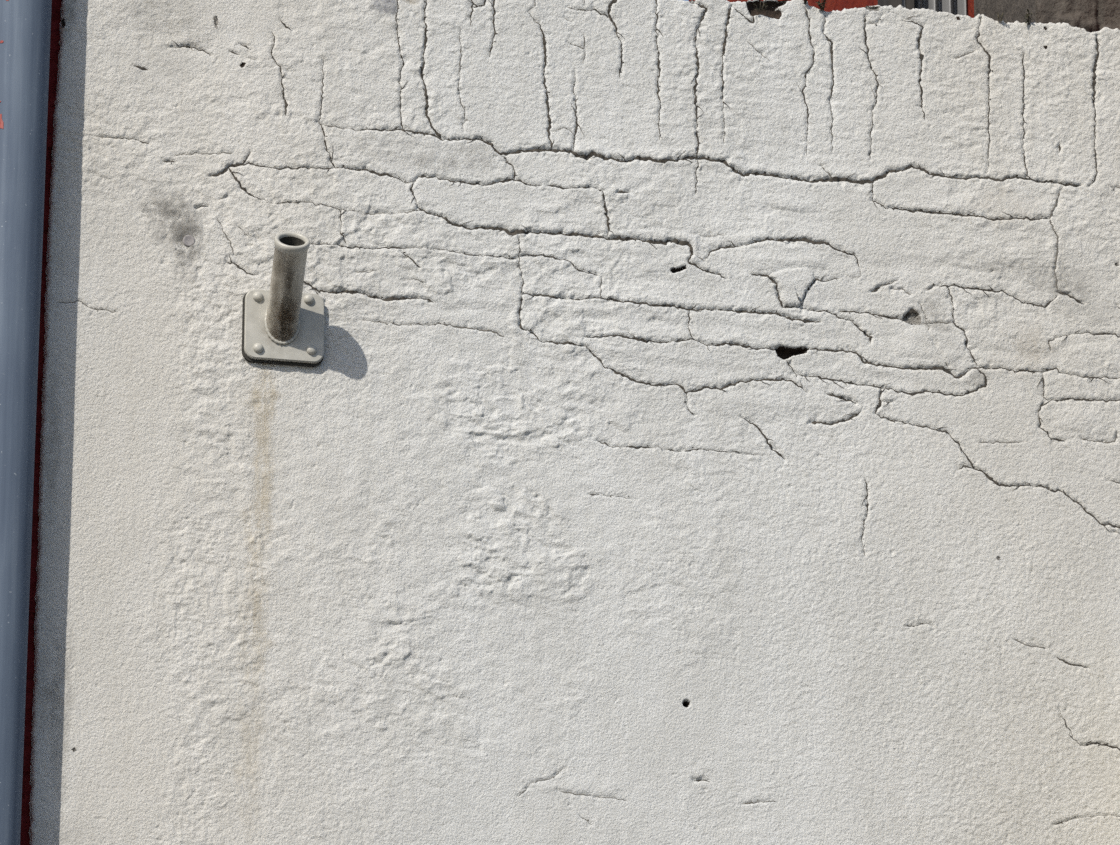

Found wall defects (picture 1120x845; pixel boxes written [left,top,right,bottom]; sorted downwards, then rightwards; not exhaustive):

spalling [746,0,788,19]
crack [96,0,1120,533]
crack [861,480,869,555]
crack [1060,712,1120,750]
crack [519,768,628,823]